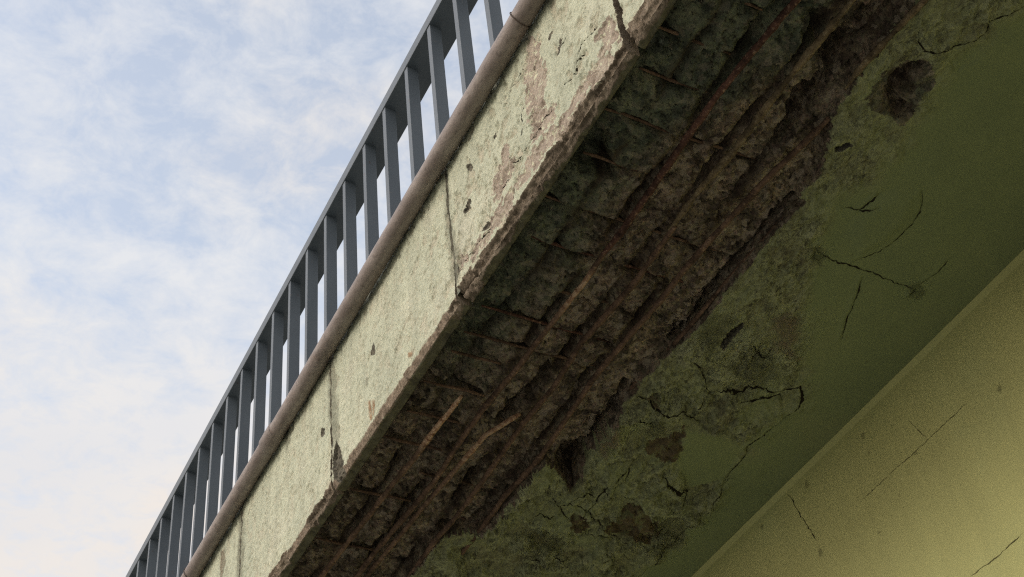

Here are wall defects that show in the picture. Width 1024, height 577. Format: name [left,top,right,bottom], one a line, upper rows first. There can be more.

spalling [268,0,937,577]
crack [814,194,948,338]